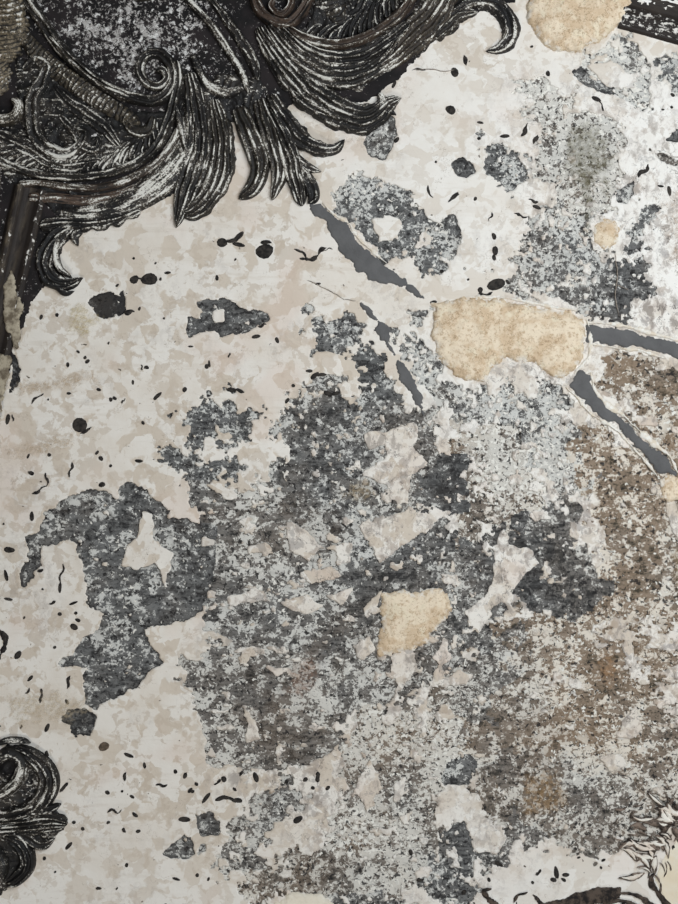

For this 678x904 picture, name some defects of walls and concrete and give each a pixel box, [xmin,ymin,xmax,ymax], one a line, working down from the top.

crack [310,202,424,299]
peeling [363,116,399,161]
peeling [330,170,462,279]
peeling [451,32,678,329]
crack [308,280,424,416]
crack [466,255,678,480]
peeling [19,298,639,904]